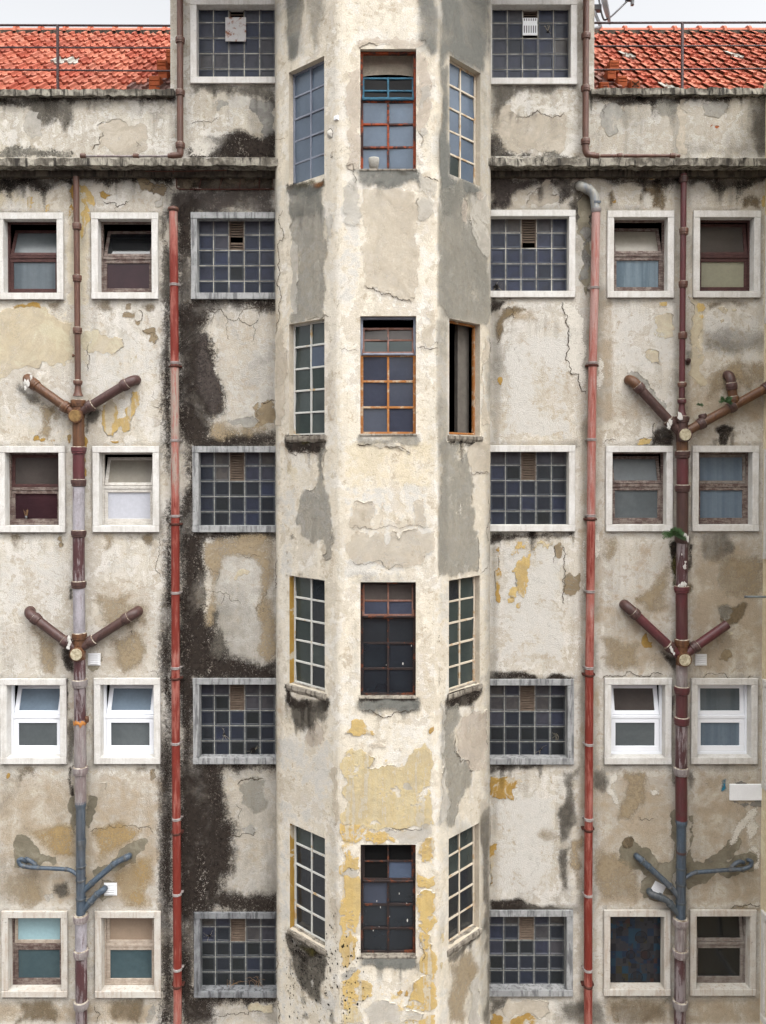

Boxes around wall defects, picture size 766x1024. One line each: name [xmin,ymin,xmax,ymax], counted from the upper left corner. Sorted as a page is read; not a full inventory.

damp [89,178,136,188]
damp [187,129,275,157]
crack [562,305,586,392]
flaking render [291,446,334,560]
damp [112,178,420,1024]
peeling [494,541,563,608]
flaking render [563,573,581,596]
peeling [330,703,523,1024]